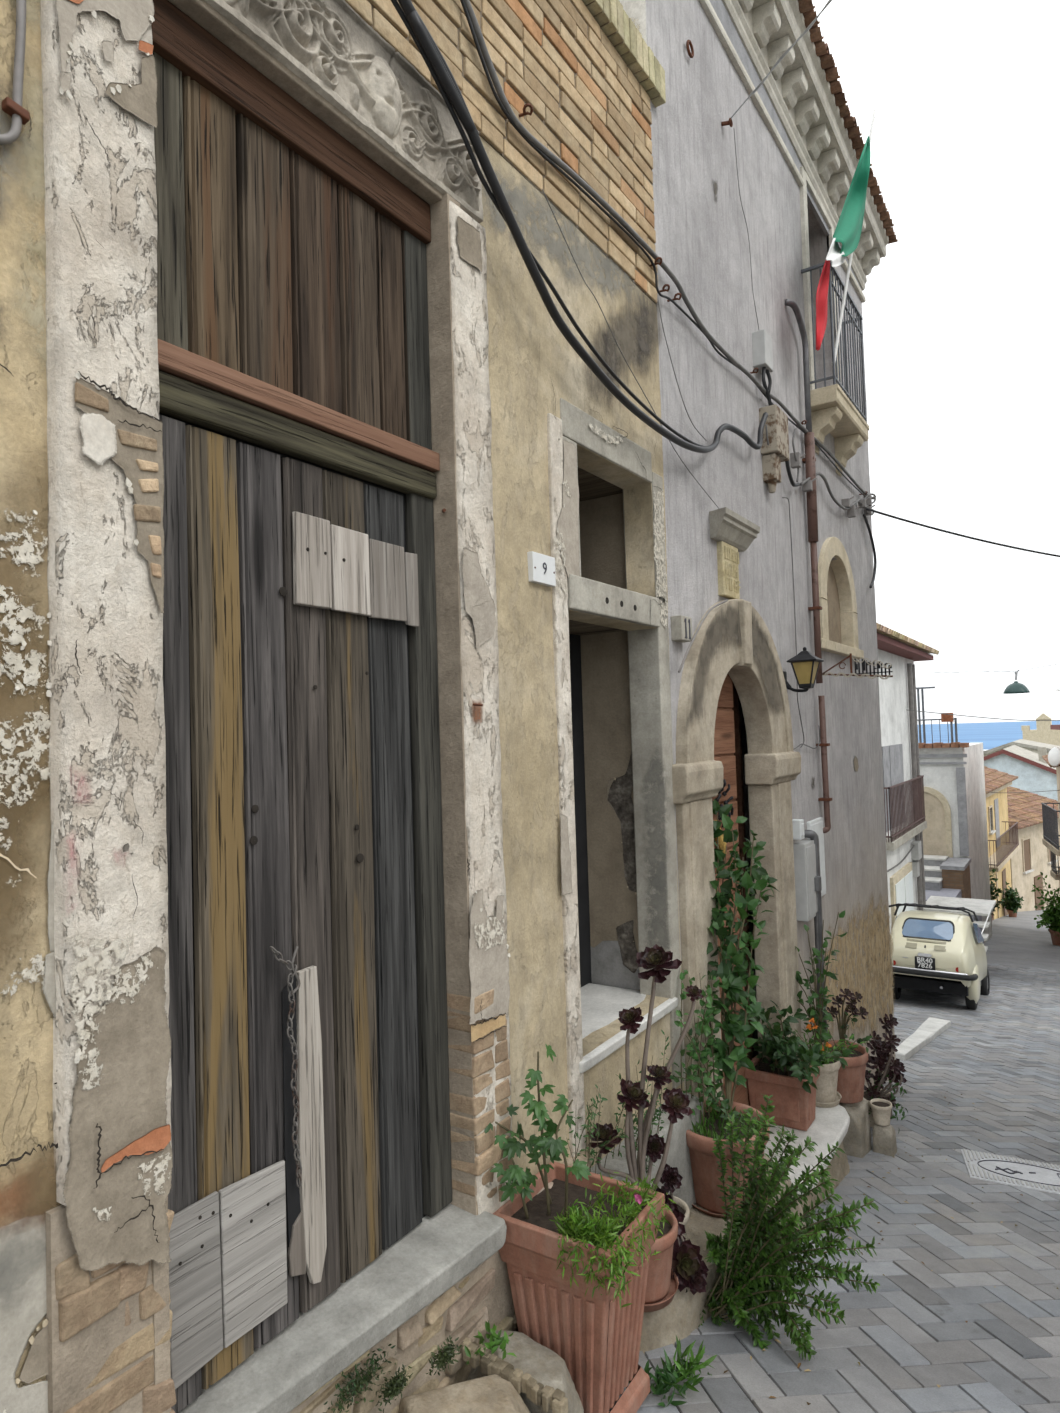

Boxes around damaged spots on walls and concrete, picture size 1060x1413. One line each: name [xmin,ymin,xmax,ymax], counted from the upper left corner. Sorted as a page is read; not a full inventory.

peeling [55,0,157,127]
damp [0,84,45,199]
damp [481,168,660,401]
peeling [0,510,51,578]
flaking render [74,372,164,614]
peeling [0,584,52,850]
flaking render [607,751,637,895]
peeling [0,822,173,1271]
crack [0,1142,58,1167]
crack [94,1123,164,1189]
crack [114,1195,160,1243]
flaking render [15,1319,49,1384]